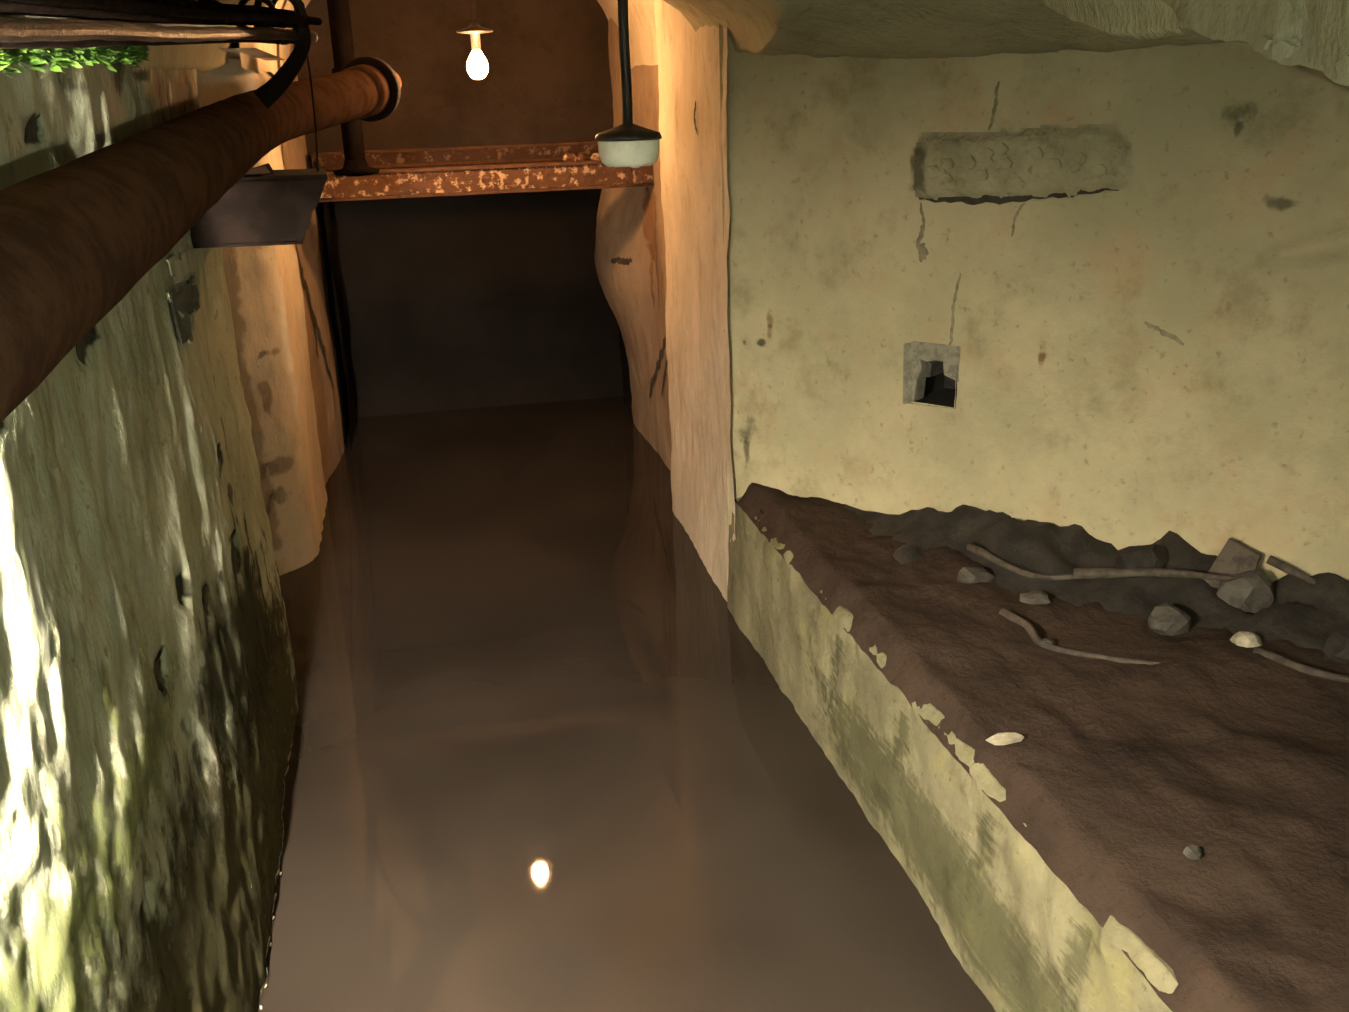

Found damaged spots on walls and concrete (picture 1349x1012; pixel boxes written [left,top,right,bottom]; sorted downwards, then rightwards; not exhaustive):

spalling [910,124,1135,205]
water stain [23,515,49,679]
water stain [22,723,66,856]
water stain [102,483,299,1012]